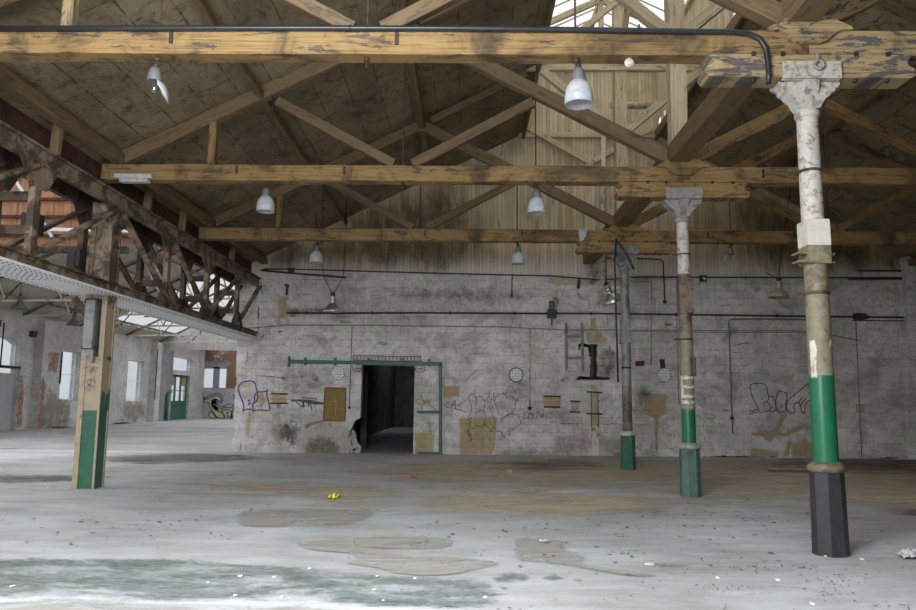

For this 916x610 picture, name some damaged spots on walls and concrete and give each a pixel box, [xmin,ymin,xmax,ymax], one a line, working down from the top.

peeling [809,340,817,378]
flaking render [38,353,59,428]
peeling [681,376,695,404]